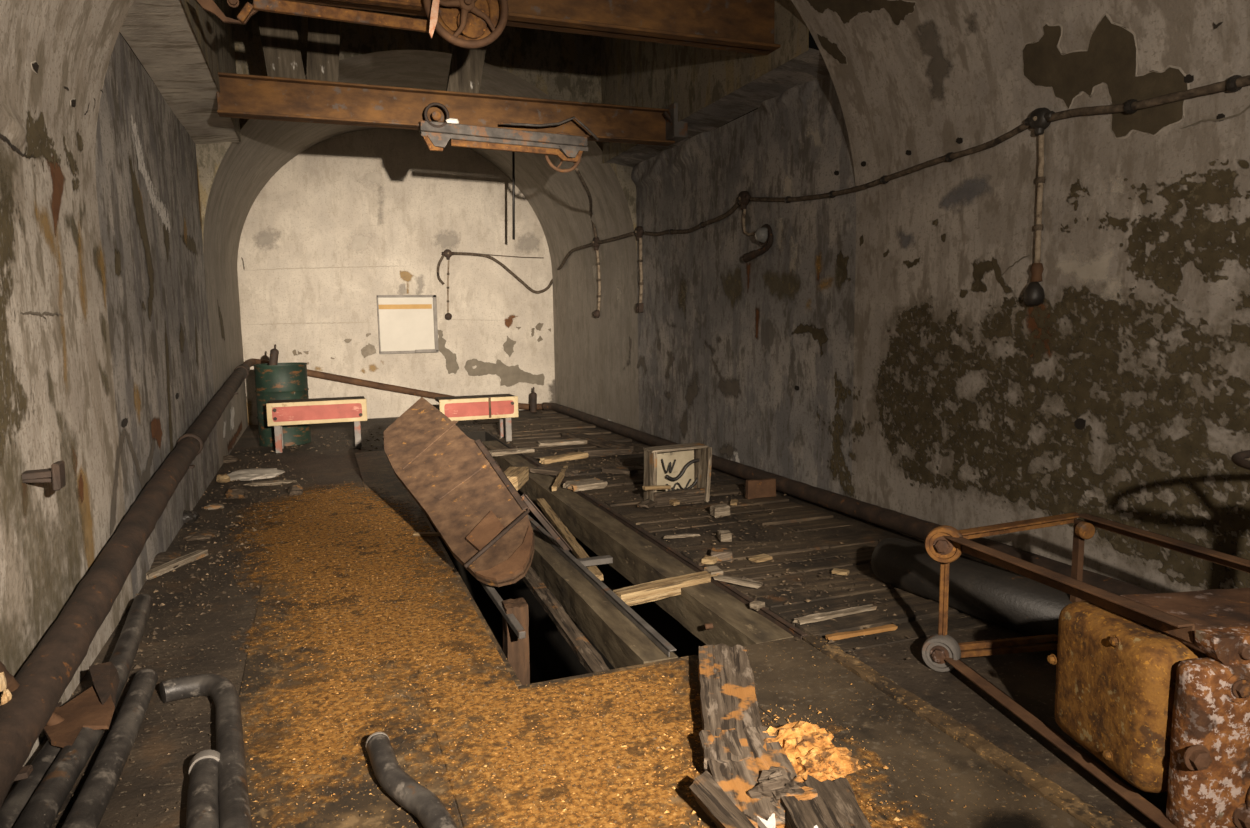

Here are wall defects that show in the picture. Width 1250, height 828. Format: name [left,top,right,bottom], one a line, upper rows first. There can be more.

peeling [1022,13,1190,139]
crack [0,134,34,159]
leakage [25,111,84,192]
leakage [66,205,121,282]
leakage [0,153,84,675]
leakage [99,362,109,395]
peeling [438,323,551,387]